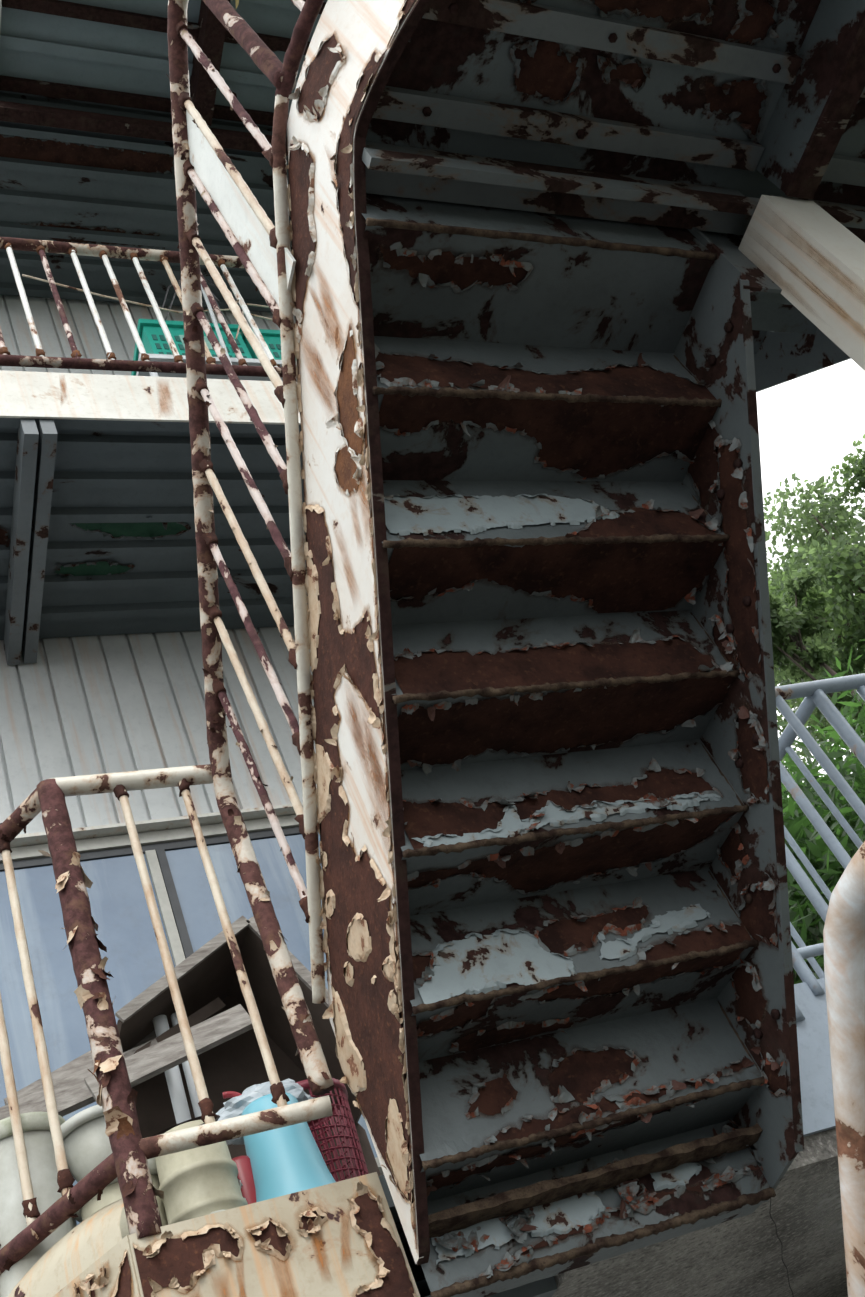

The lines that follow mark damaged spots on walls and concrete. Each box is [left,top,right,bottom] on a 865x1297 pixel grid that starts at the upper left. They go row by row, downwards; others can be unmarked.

peeling [285,0,787,1297]
peeling [55,852,93,893]
peeling [62,916,116,1010]
peeling [88,1055,138,1140]
peeling [121,1178,164,1199]
peeling [73,1206,328,1297]